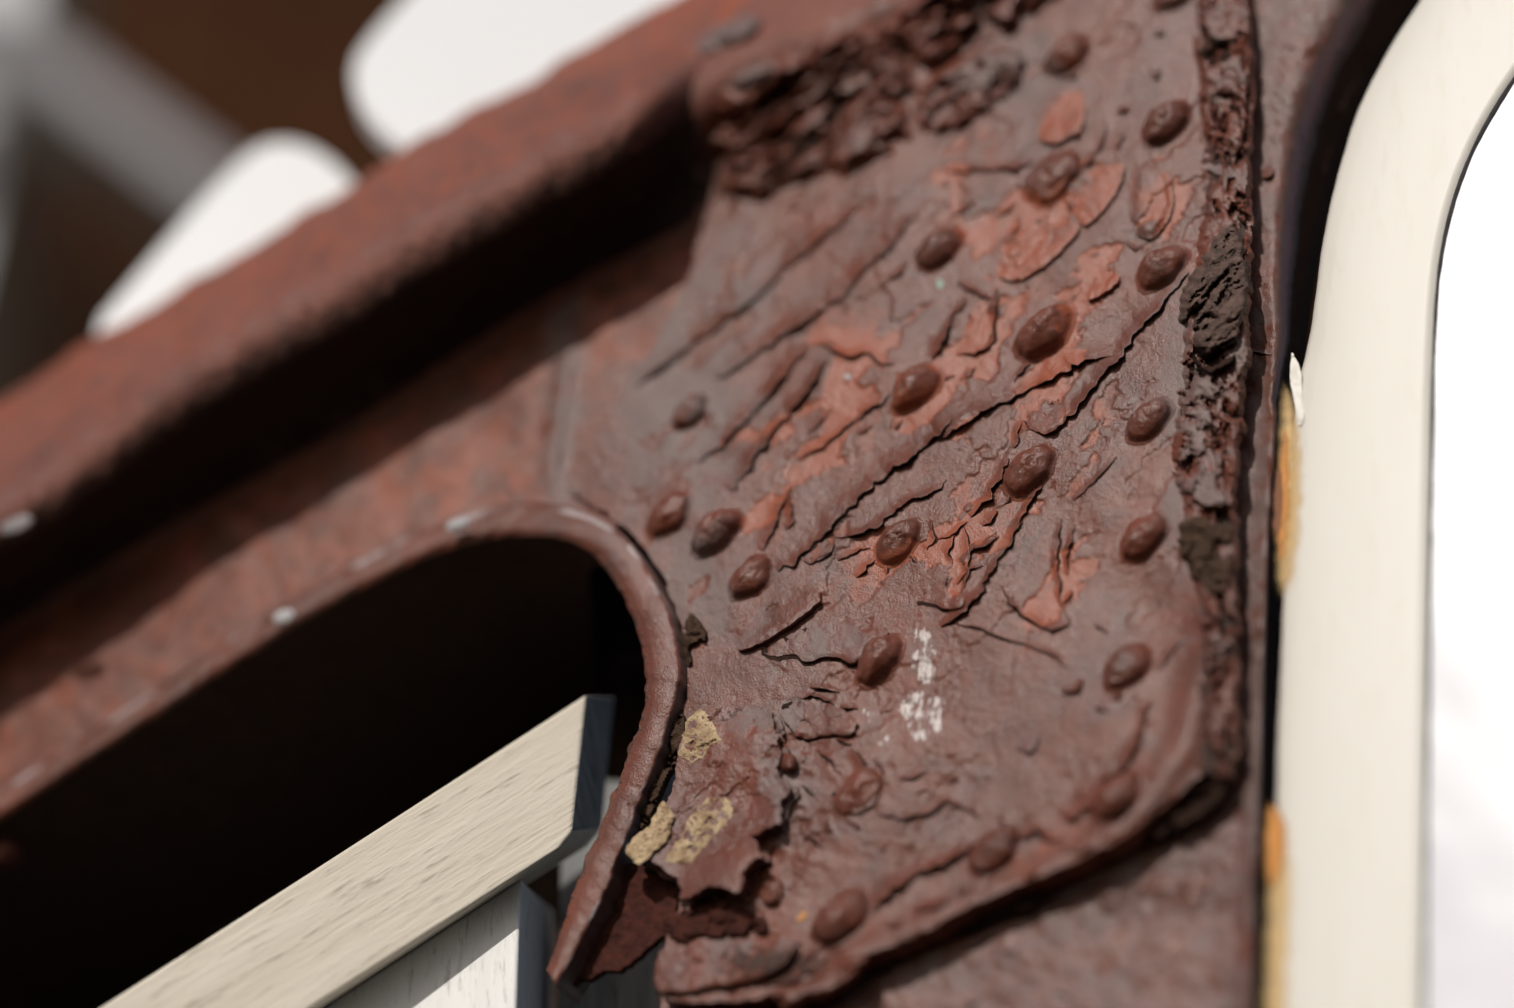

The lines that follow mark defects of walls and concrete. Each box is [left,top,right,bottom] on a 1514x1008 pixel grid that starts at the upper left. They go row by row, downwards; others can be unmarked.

peeling [1038,91,1086,148]
crack [1058,62,1088,82]
crack [1063,28,1165,214]
peeling [996,159,1175,284]
peeling [959,300,994,355]
peeling [813,538,836,563]
crack [625,152,1189,951]
corrosion [1273,396,1300,585]
peeling [737,585,889,668]
peeling [641,698,859,908]
peeling [654,937,799,998]
corrosion [1266,807,1288,1008]